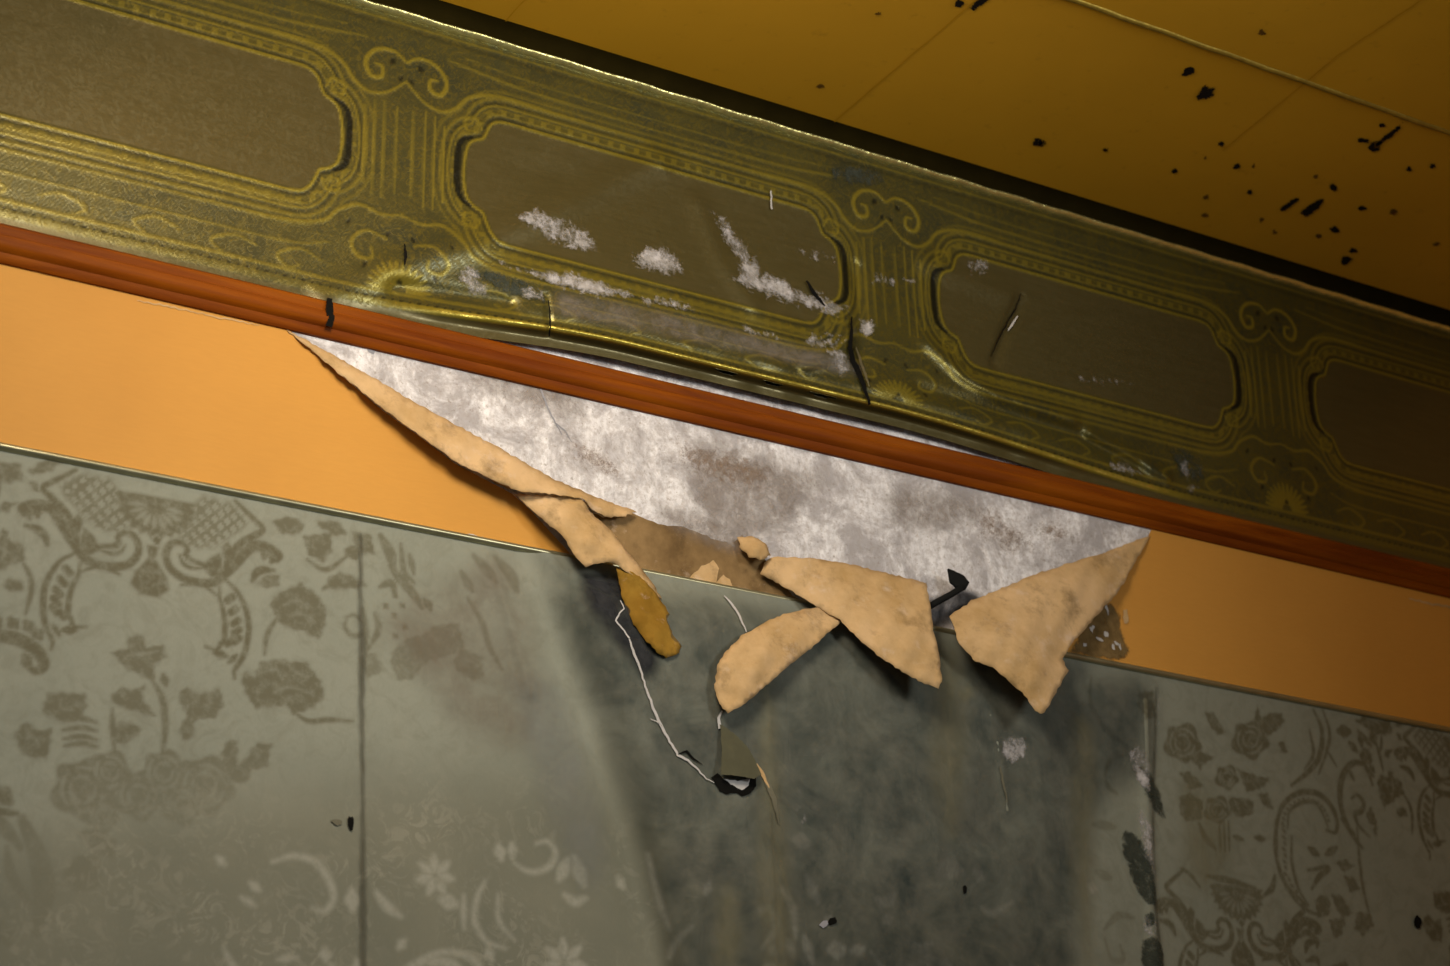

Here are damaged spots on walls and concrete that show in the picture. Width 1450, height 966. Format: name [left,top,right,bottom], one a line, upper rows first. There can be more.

damp [955,0,988,11]
damp [1182,67,1215,100]
damp [1358,122,1403,153]
damp [1280,175,1337,217]
crack [724,595,747,632]
peeling [1083,605,1129,650]
crack [615,600,714,783]
peeling [1003,738,1025,762]
damp [573,575,1164,966]
peeling [1132,755,1150,790]